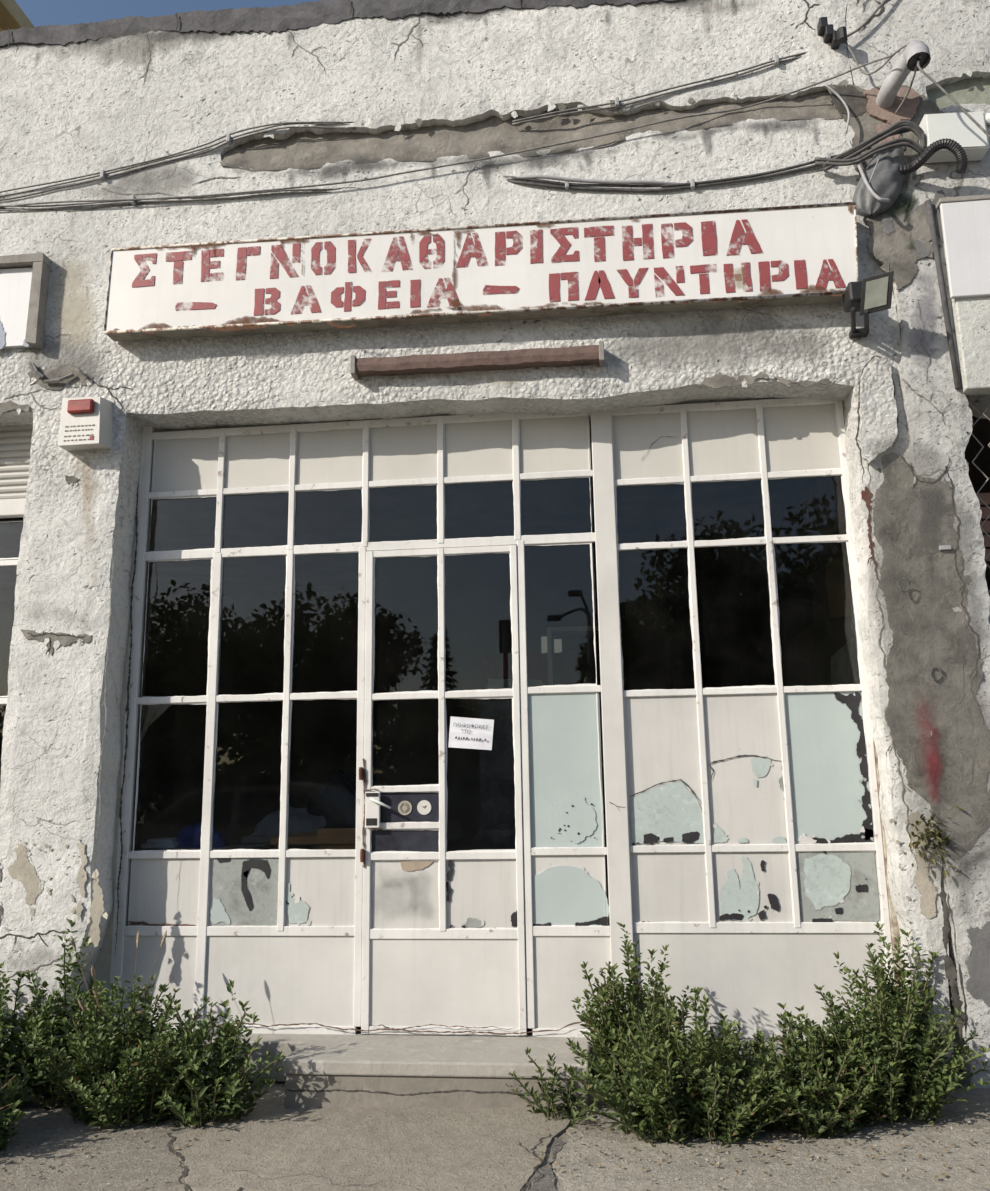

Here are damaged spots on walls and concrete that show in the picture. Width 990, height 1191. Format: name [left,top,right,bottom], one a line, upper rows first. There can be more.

crack [390,16,423,60]
spalling [220,67,990,195]
spalling [865,187,945,290]
spalling [27,362,94,391]
crack [855,302,984,726]
spalling [21,629,92,655]
crack [29,483,139,958]
crack [867,511,966,1037]
peeling [859,452,990,919]
peeling [0,839,108,947]
crack [0,930,76,977]
crack [167,1132,189,1191]